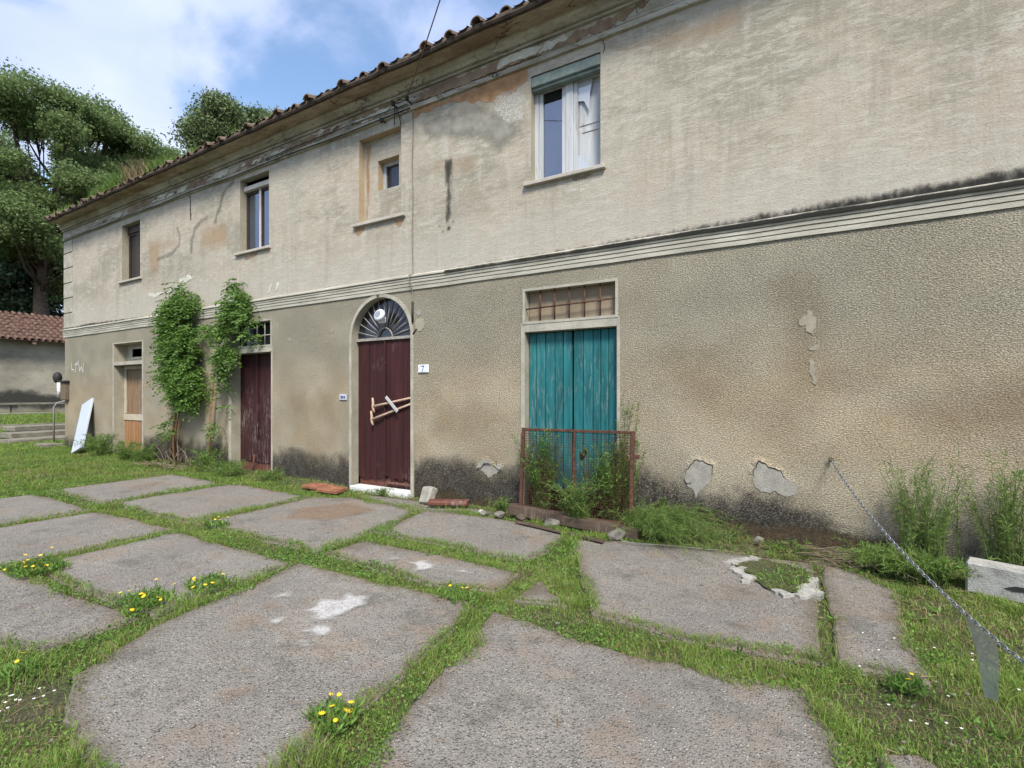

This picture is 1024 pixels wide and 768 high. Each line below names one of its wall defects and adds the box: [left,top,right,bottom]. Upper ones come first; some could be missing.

peeling [110,0,649,220]
crack [71,120,356,234]
leakage [674,168,1024,233]
peeling [798,310,818,385]
leakage [273,449,349,488]
leakage [414,459,520,505]
spalling [476,456,505,479]
spalling [680,454,718,499]
leakage [621,473,888,549]
spalling [747,455,803,499]